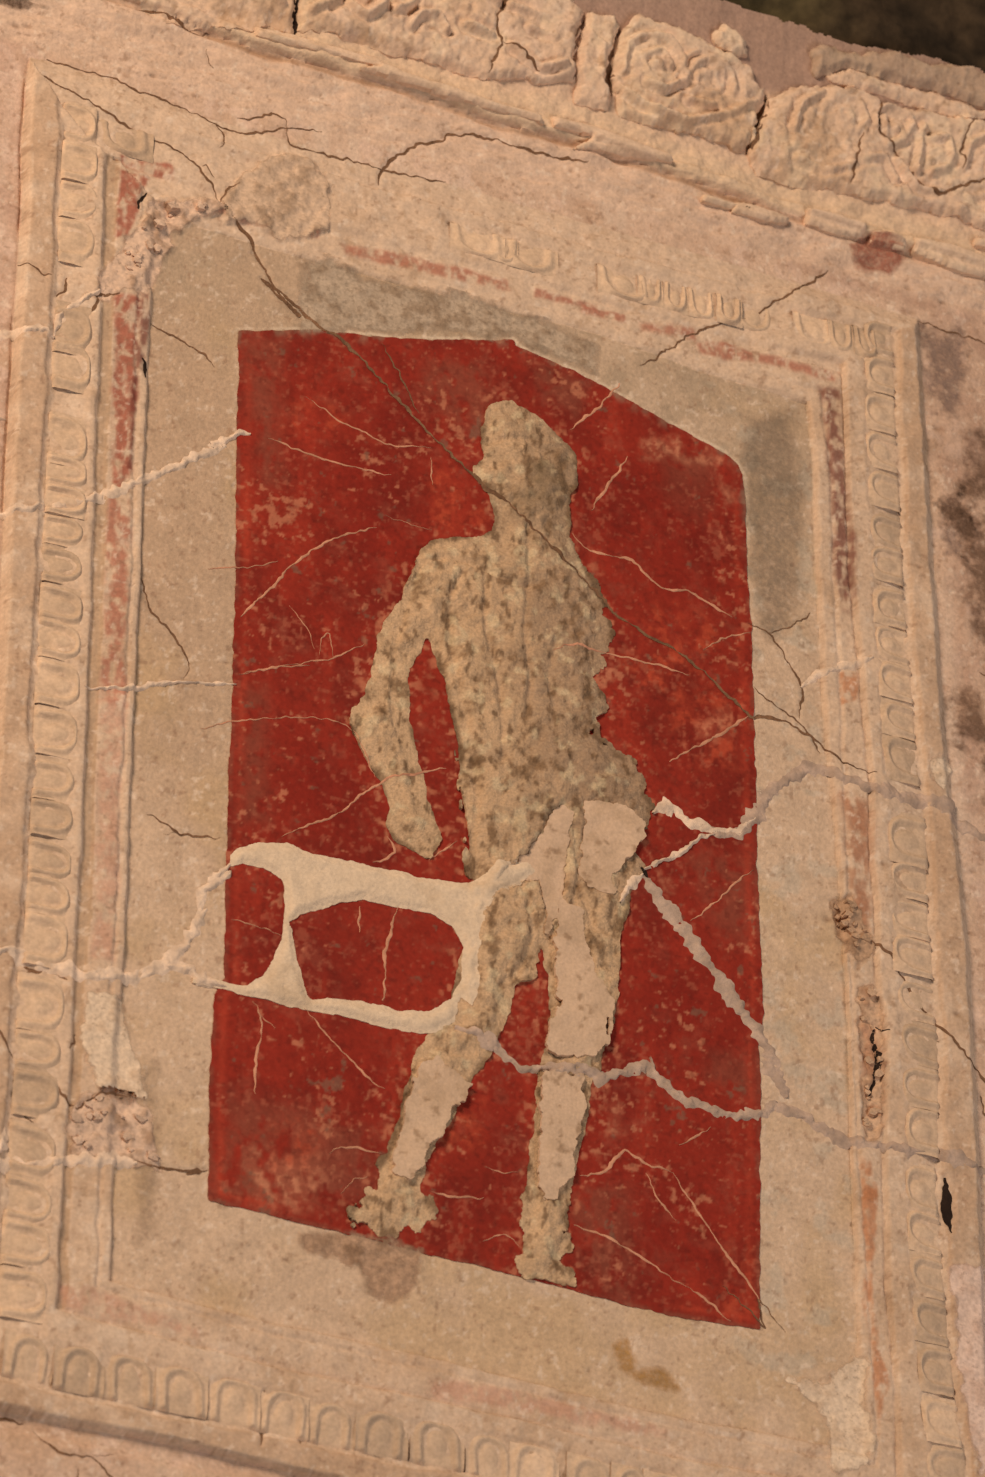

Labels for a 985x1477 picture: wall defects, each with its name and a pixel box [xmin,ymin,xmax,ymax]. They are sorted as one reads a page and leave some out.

spalling [95,153,331,301]
water stain [942,431,985,637]
crack [0,59,985,1233]
water stain [956,692,985,748]
spalling [829,894,887,1141]
crack [575,1149,785,1331]
crack [0,1417,112,1477]